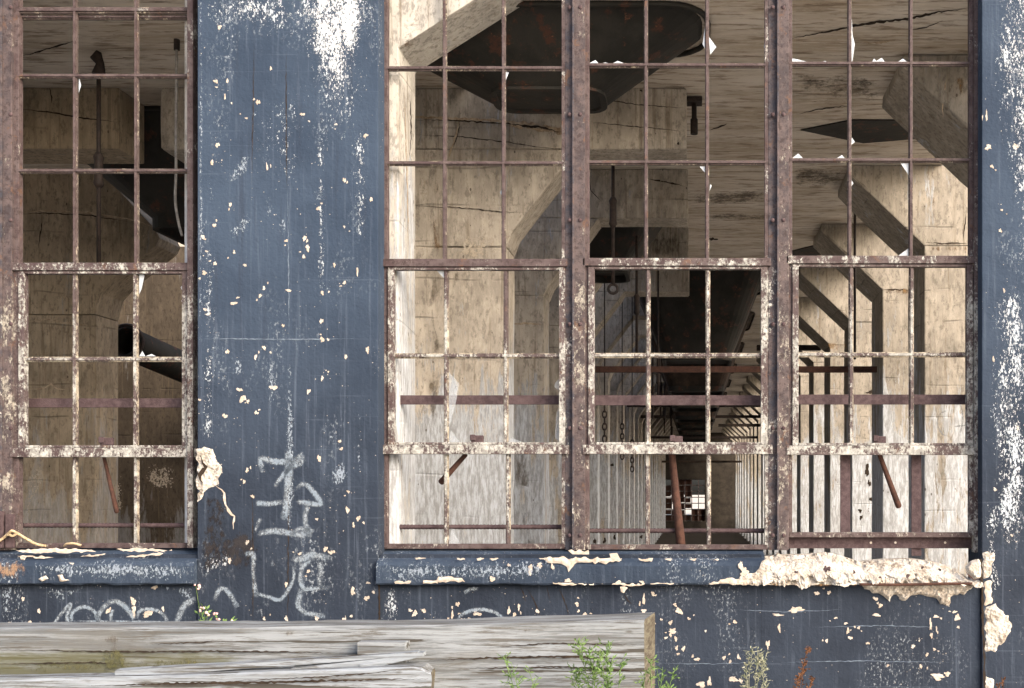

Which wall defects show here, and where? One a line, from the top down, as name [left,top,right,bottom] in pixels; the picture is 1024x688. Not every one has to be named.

crack [795,8,965,44]
peeling [17,548,105,565]
peeling [118,548,172,557]
peeling [394,576,465,584]
peeling [528,535,622,615]
peeling [613,580,674,613]
spalling [710,551,1012,681]